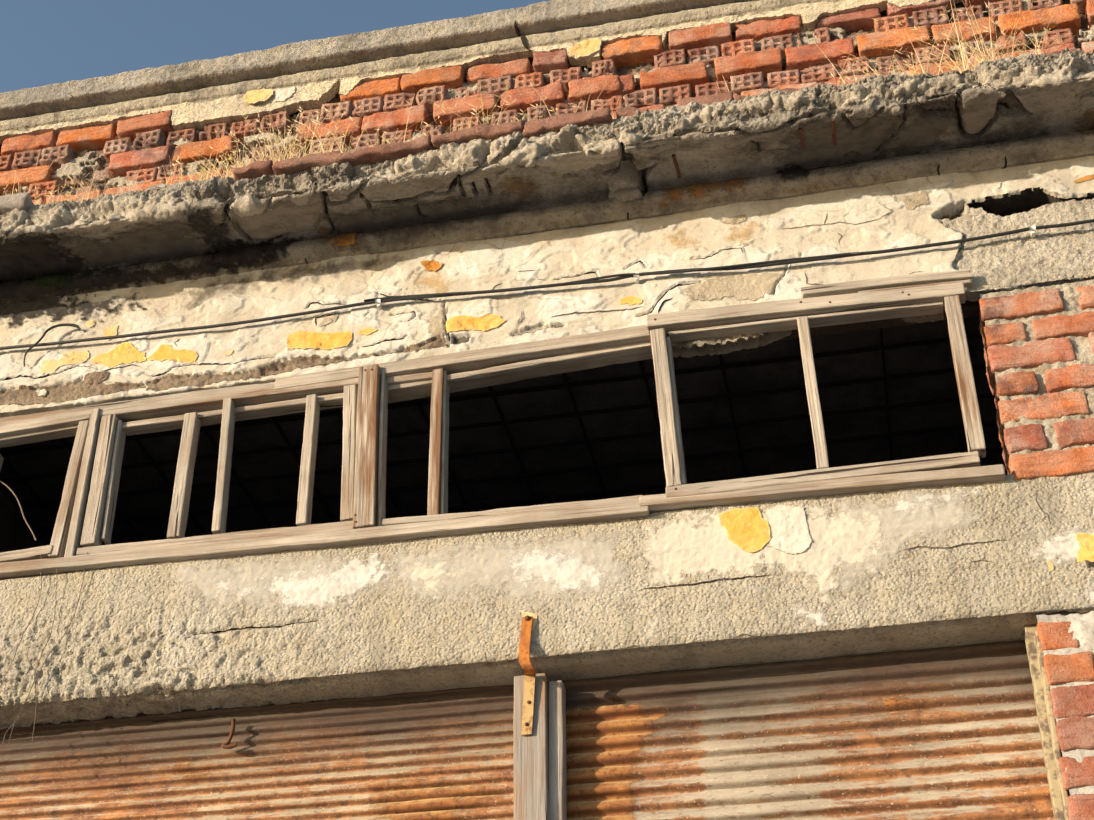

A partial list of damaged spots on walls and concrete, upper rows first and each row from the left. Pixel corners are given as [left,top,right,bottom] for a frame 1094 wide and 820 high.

spalling [375,126,648,203]
spalling [0,193,193,238]
leakage [0,205,349,329]
flaking render [0,307,506,405]
crack [305,291,450,349]
crack [492,244,749,325]
flaking render [935,174,1094,292]
crack [637,572,781,591]
crack [188,618,317,635]
corrosion [173,761,209,785]
corrosion [374,778,501,820]
corrosion [566,702,664,820]